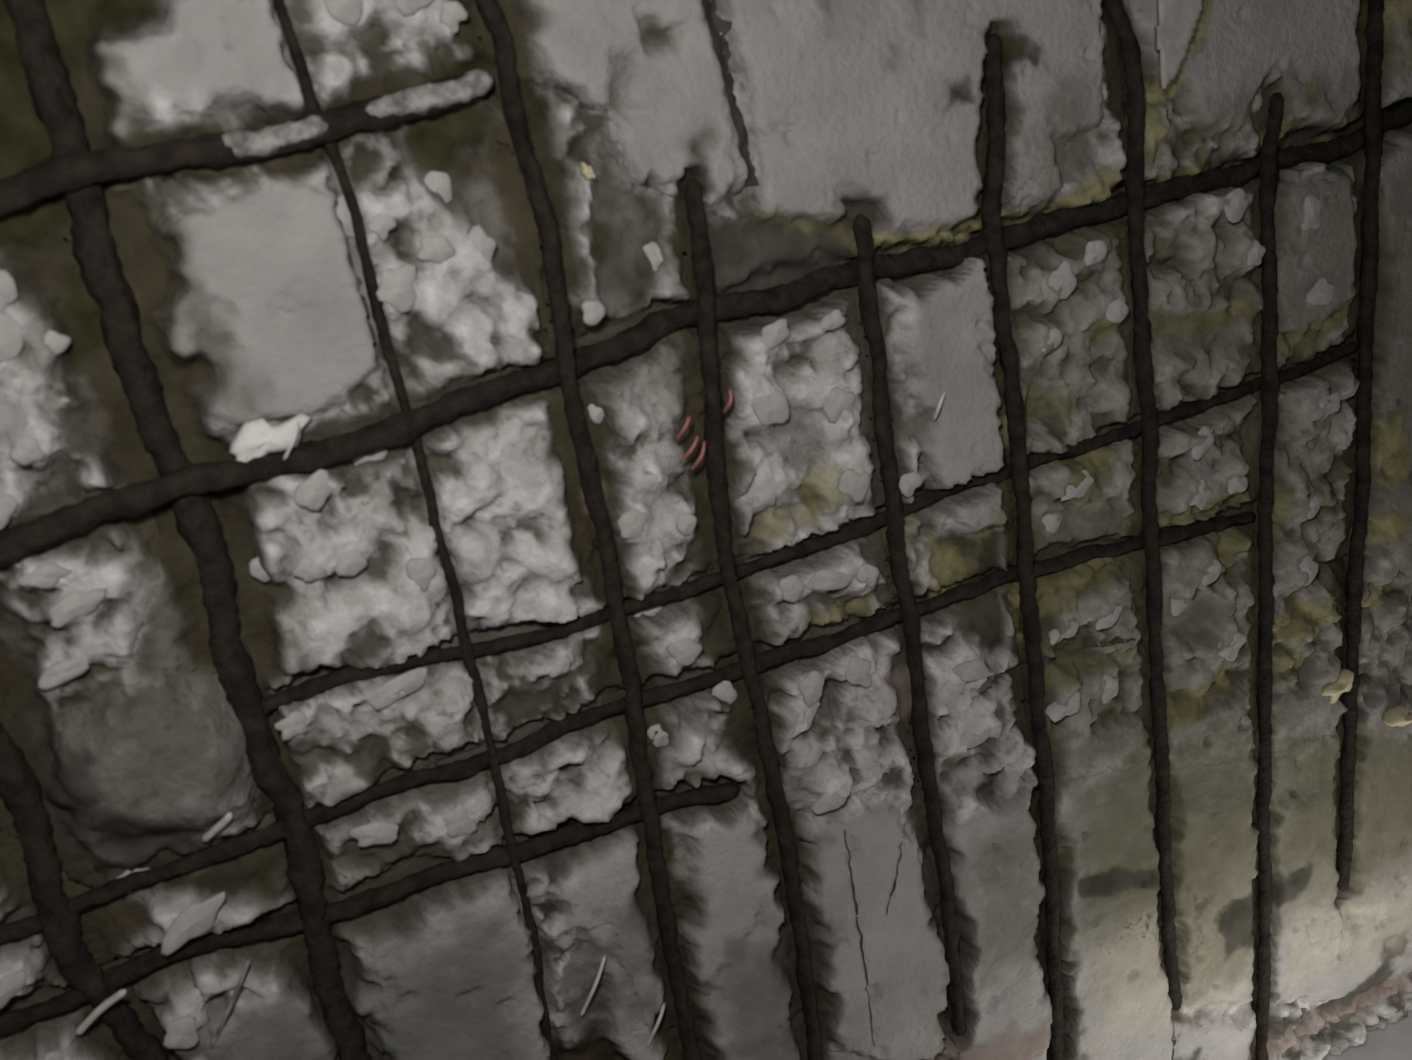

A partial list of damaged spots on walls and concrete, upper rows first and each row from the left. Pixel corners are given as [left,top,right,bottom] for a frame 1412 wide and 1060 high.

spalling [0,0,740,1060]
corrosion [552,1027,629,1060]
crack [702,0,759,188]
spalling [518,0,1412,1060]